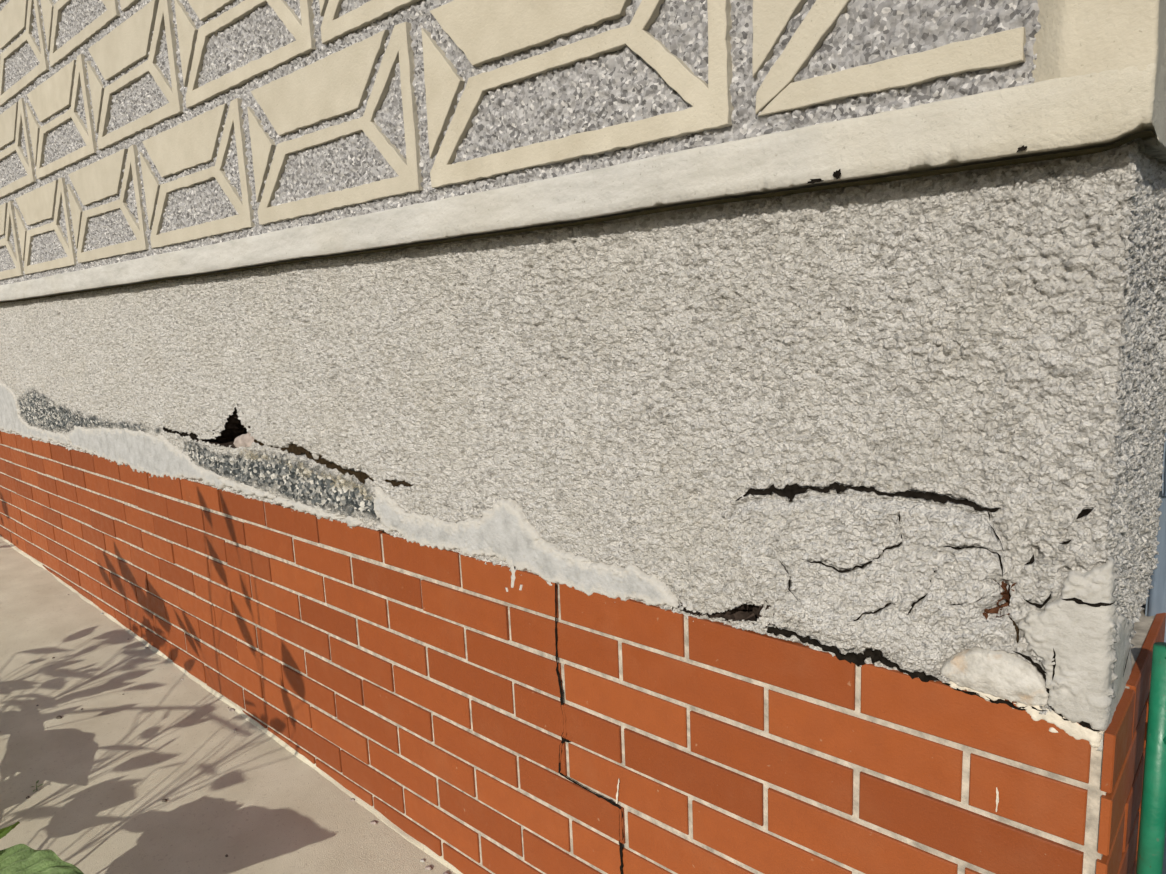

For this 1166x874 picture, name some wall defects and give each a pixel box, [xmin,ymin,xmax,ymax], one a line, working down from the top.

peeling [17,390,159,433]
crack [163,427,198,441]
peeling [183,403,380,520]
crack [254,439,414,487]
crack [736,482,1115,732]
crack [555,583,623,874]